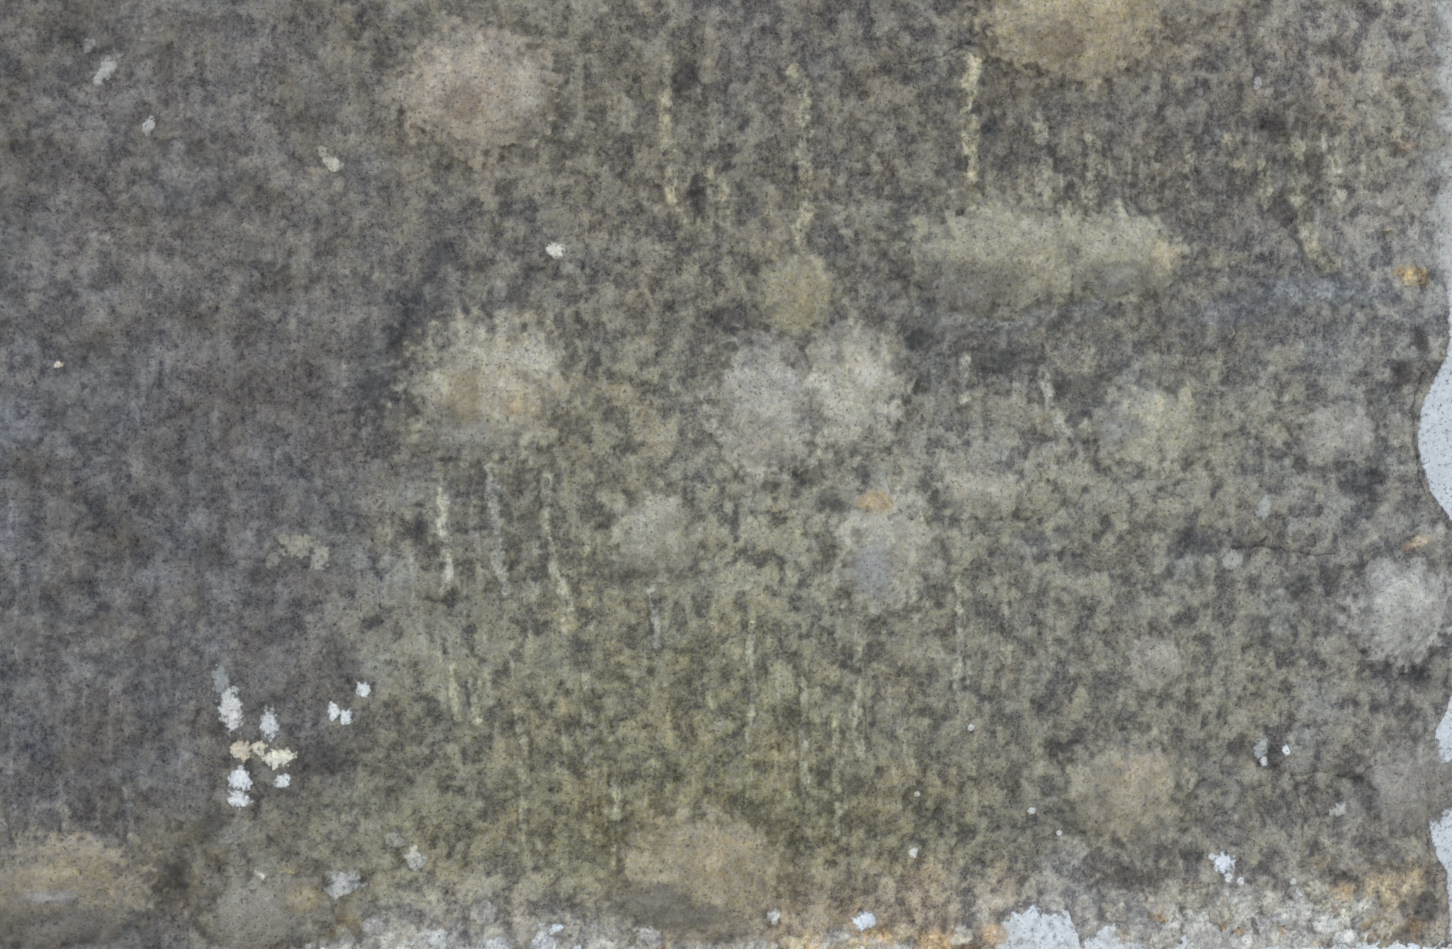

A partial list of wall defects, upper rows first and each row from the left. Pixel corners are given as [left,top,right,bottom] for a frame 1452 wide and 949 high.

peeling [317,145,344,173]
peeling [546,242,565,259]
peeling [1414,0,1452,520]
peeling [265,529,331,571]
peeling [1219,548,1243,571]
peeling [328,682,371,725]
peeling [1434,696,1452,763]
peeling [1253,738,1290,766]
peeling [1208,850,1244,886]
peeling [1217,798,1452,949]
peeling [852,911,877,932]
peeling [995,905,1194,949]